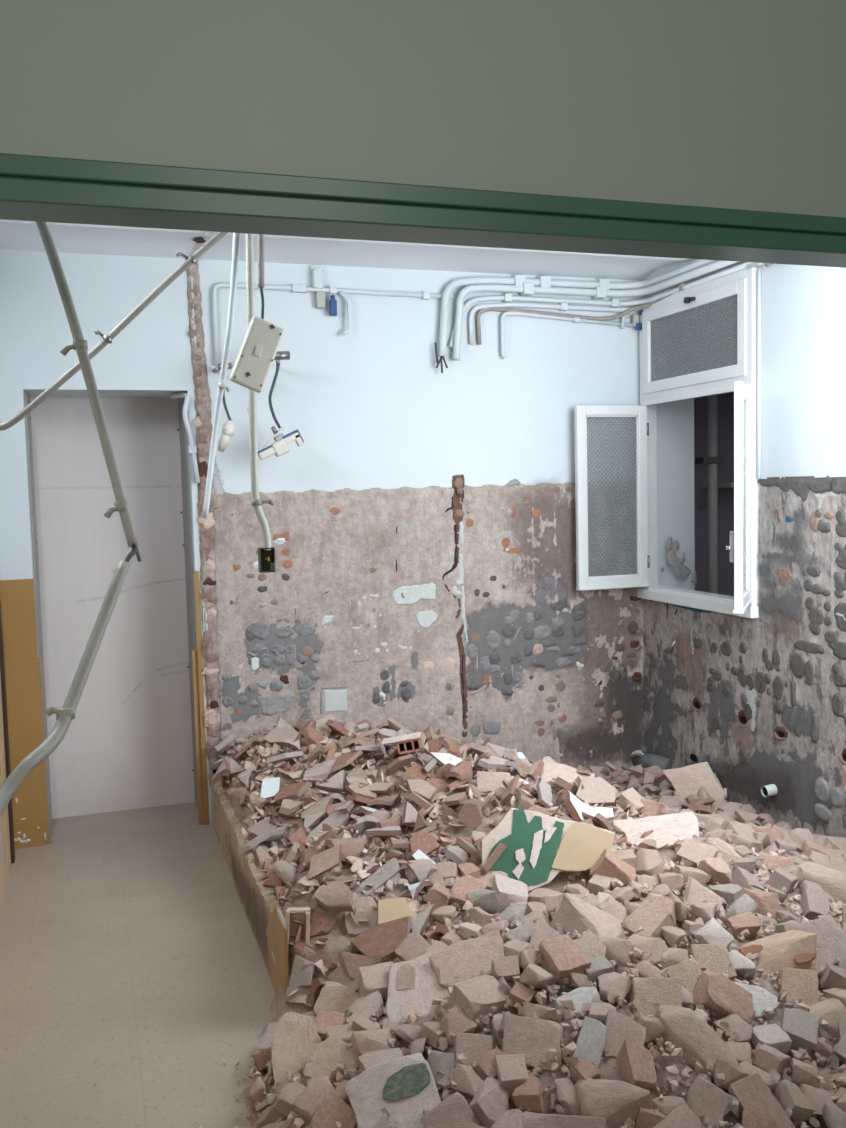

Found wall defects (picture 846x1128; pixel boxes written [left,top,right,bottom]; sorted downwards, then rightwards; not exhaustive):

crack [442,474,469,737]
spalling [212,476,846,910]
spalling [276,858,400,972]
spalling [508,981,536,1010]
spalling [538,893,669,990]
spalling [650,880,846,978]